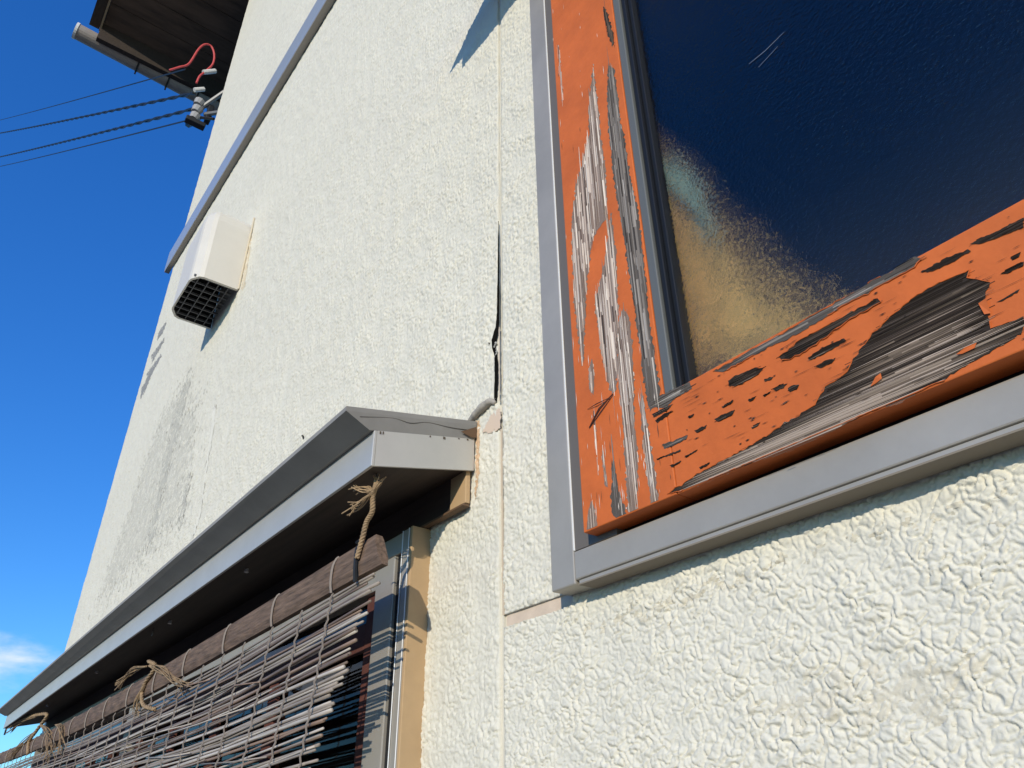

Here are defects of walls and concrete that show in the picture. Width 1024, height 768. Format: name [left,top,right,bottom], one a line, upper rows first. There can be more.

crack [492,221,500,401]
peeling [571,3,1024,530]